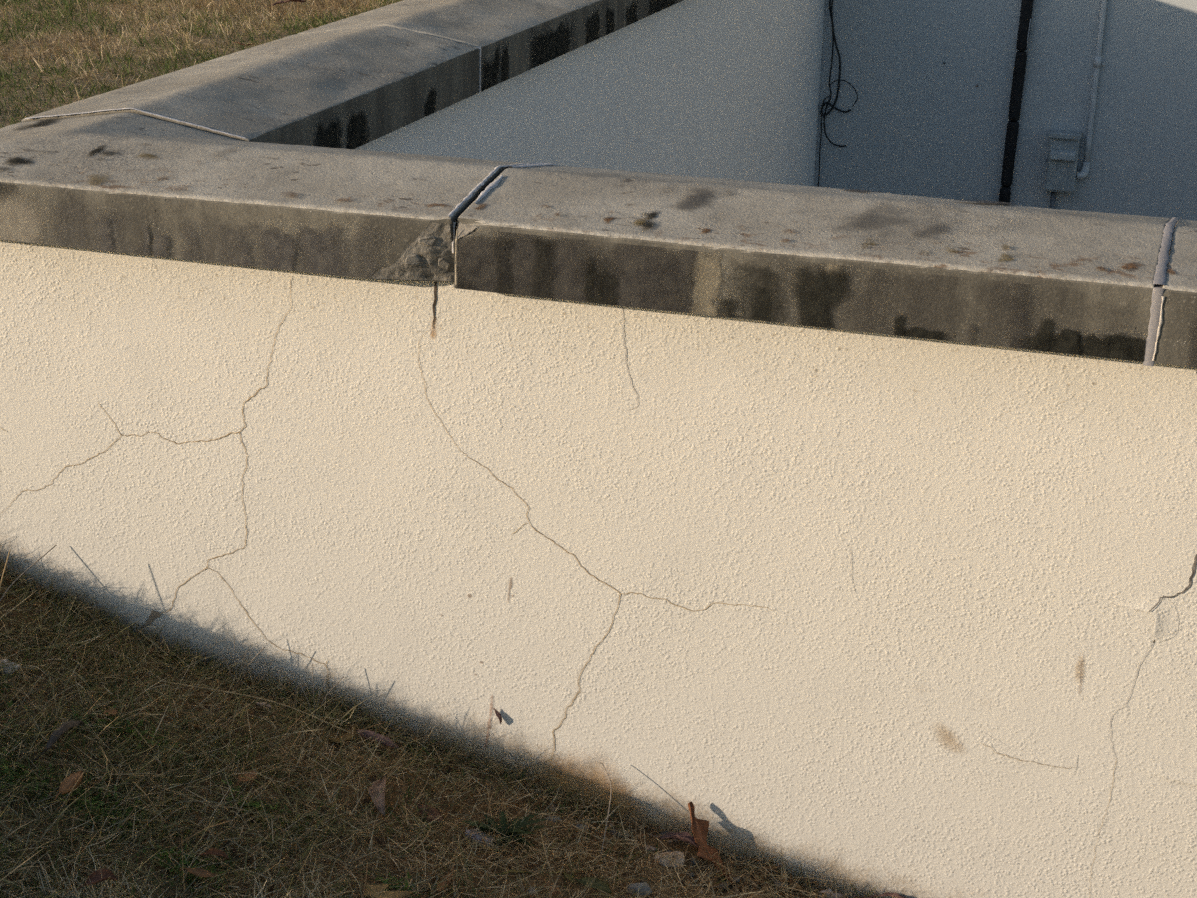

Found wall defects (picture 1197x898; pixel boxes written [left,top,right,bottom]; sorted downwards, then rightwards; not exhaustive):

leakage [482,47,509,91]
leakage [532,25,572,68]
leakage [586,0,675,44]
leakage [315,113,369,149]
leakage [205,228,348,276]
leakage [456,232,781,322]
leakage [793,264,847,328]
leakage [894,282,946,341]
leakage [967,284,1145,362]
crack [5,280,329,702]
crack [418,282,776,766]
crack [1089,554,1197,898]